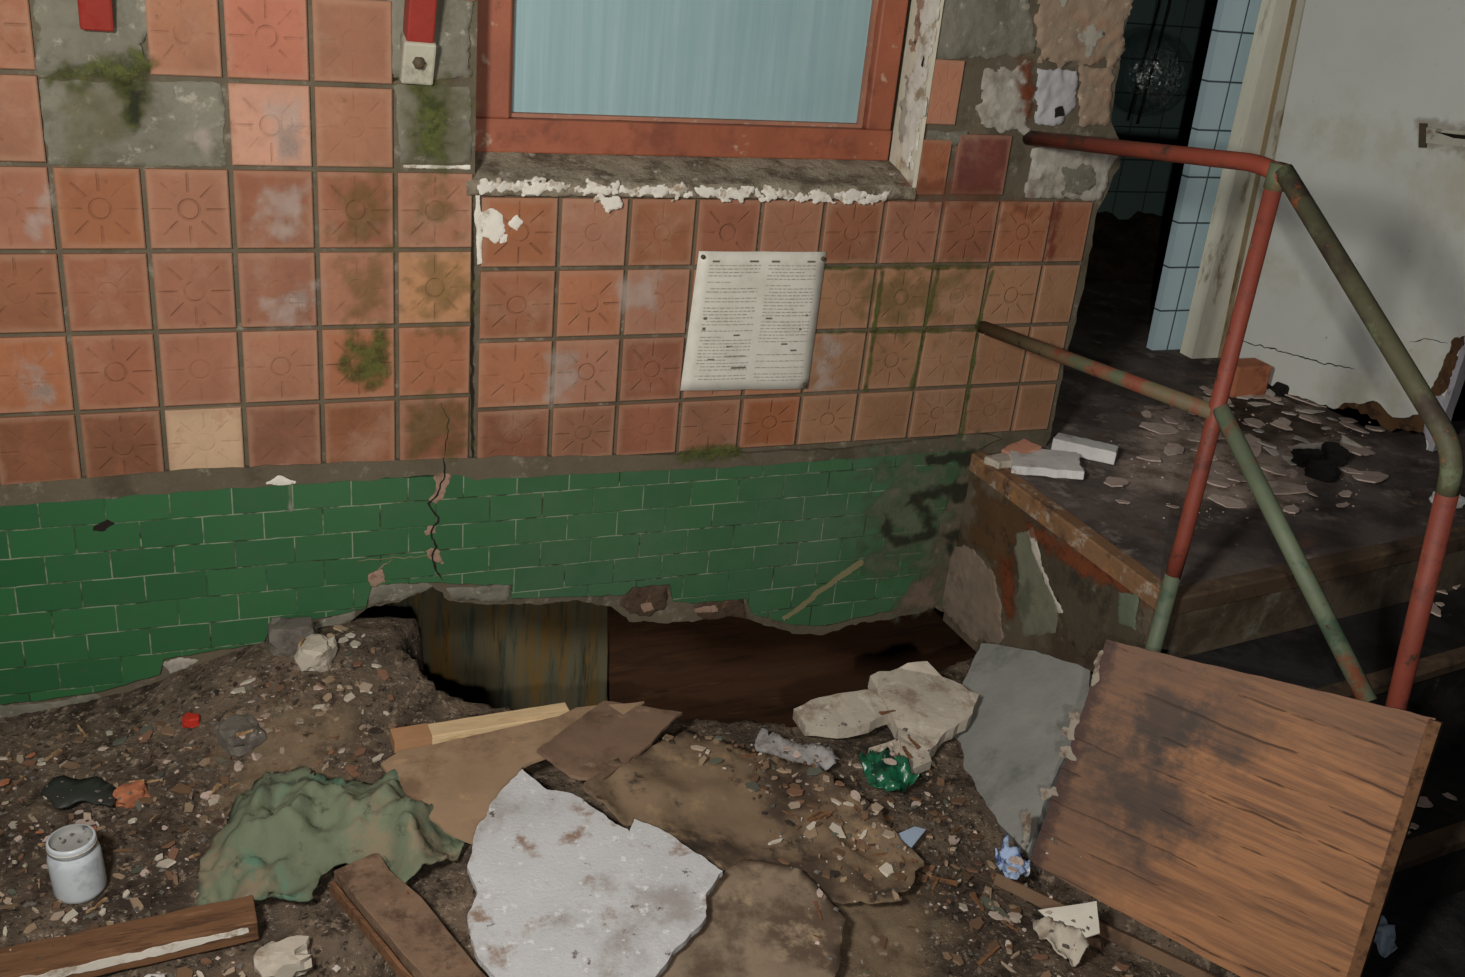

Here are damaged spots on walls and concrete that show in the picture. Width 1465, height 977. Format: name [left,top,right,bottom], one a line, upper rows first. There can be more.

spalling [387,0,891,264]
spalling [899,0,1133,201]
crack [361,214,474,587]
crack [782,560,864,621]
damp [882,451,973,554]